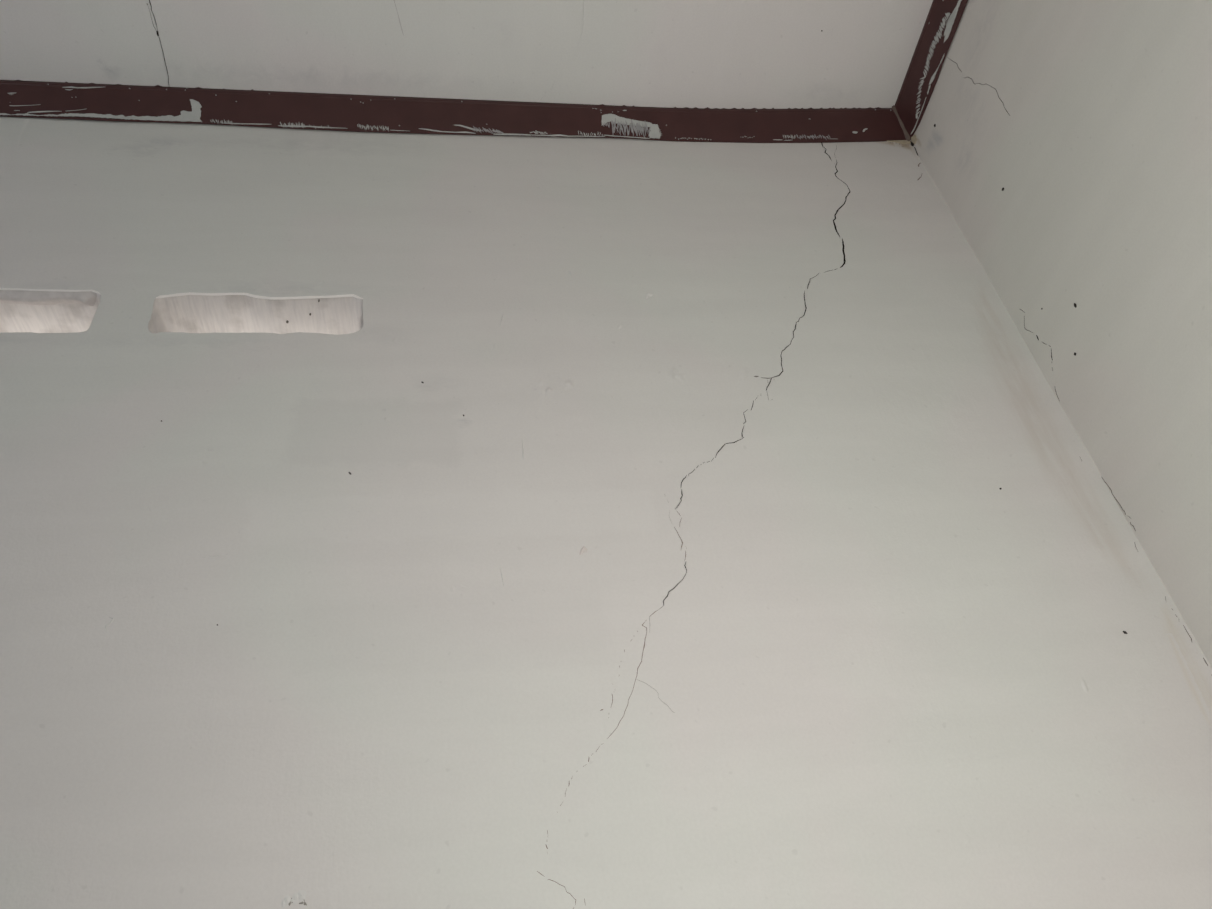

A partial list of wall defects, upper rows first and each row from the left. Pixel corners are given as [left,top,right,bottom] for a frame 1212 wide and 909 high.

crack [537,143,851,909]